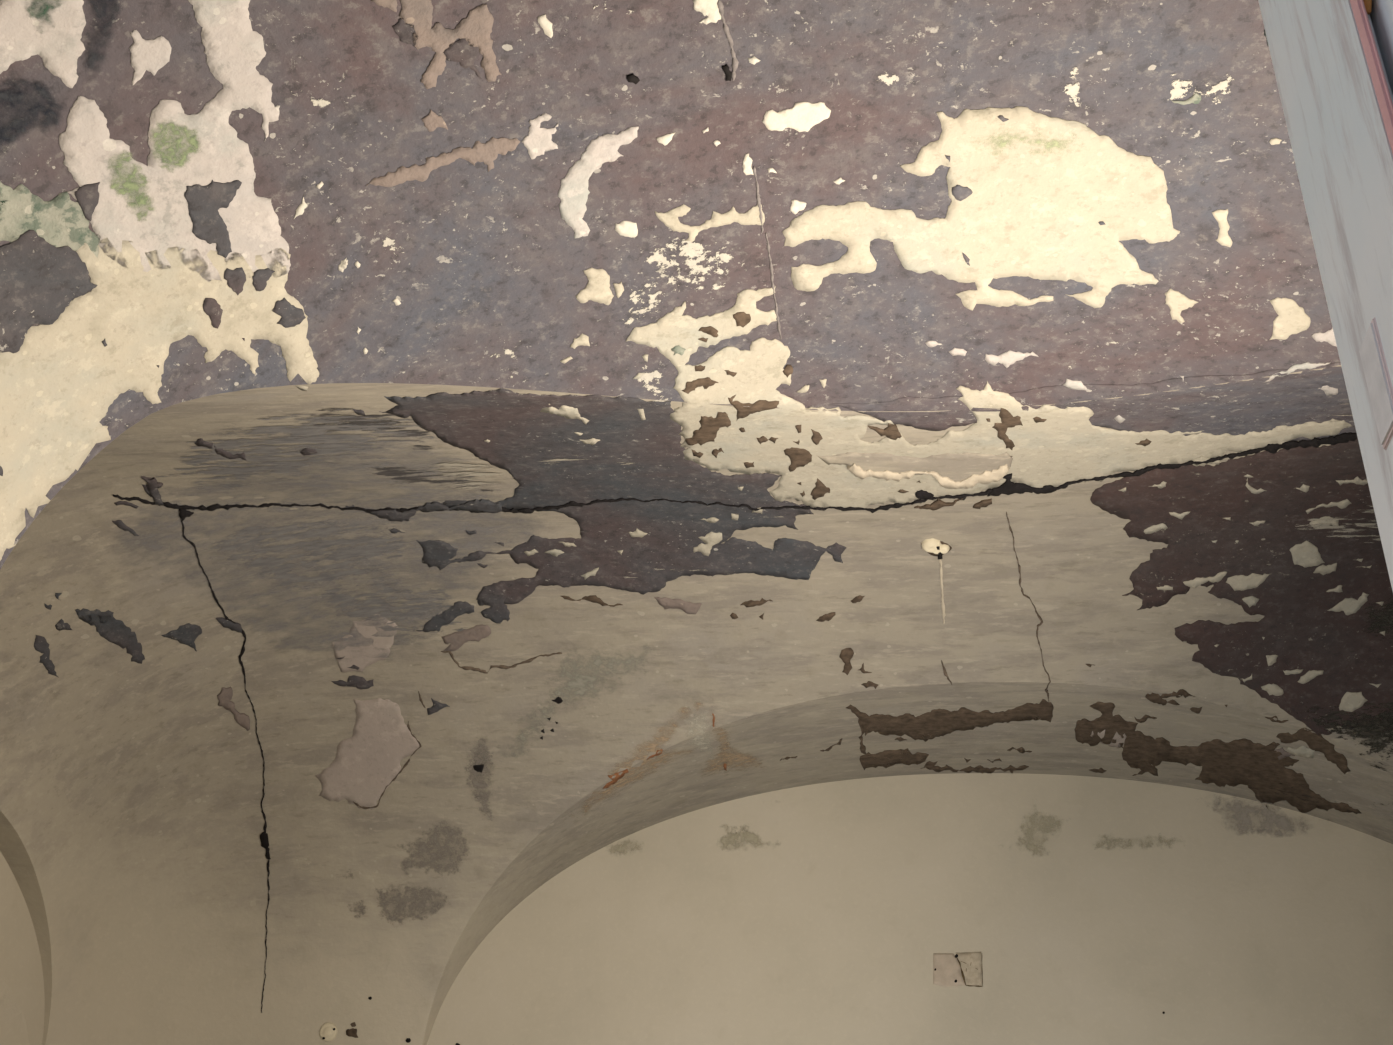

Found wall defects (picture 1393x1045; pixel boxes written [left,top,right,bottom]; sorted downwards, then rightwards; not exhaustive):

spalling [371,0,501,89]
peeling [366,113,558,187]
peeling [558,126,639,239]
peeling [693,0,721,25]
peeling [762,102,831,132]
peeling [782,67,1198,324]
peeling [1169,74,1234,105]
peeling [0,0,323,560]
peeling [576,204,1352,556]
peeling [1157,571,1269,608]
peeling [1290,476,1384,615]
crack [113,432,1358,1012]